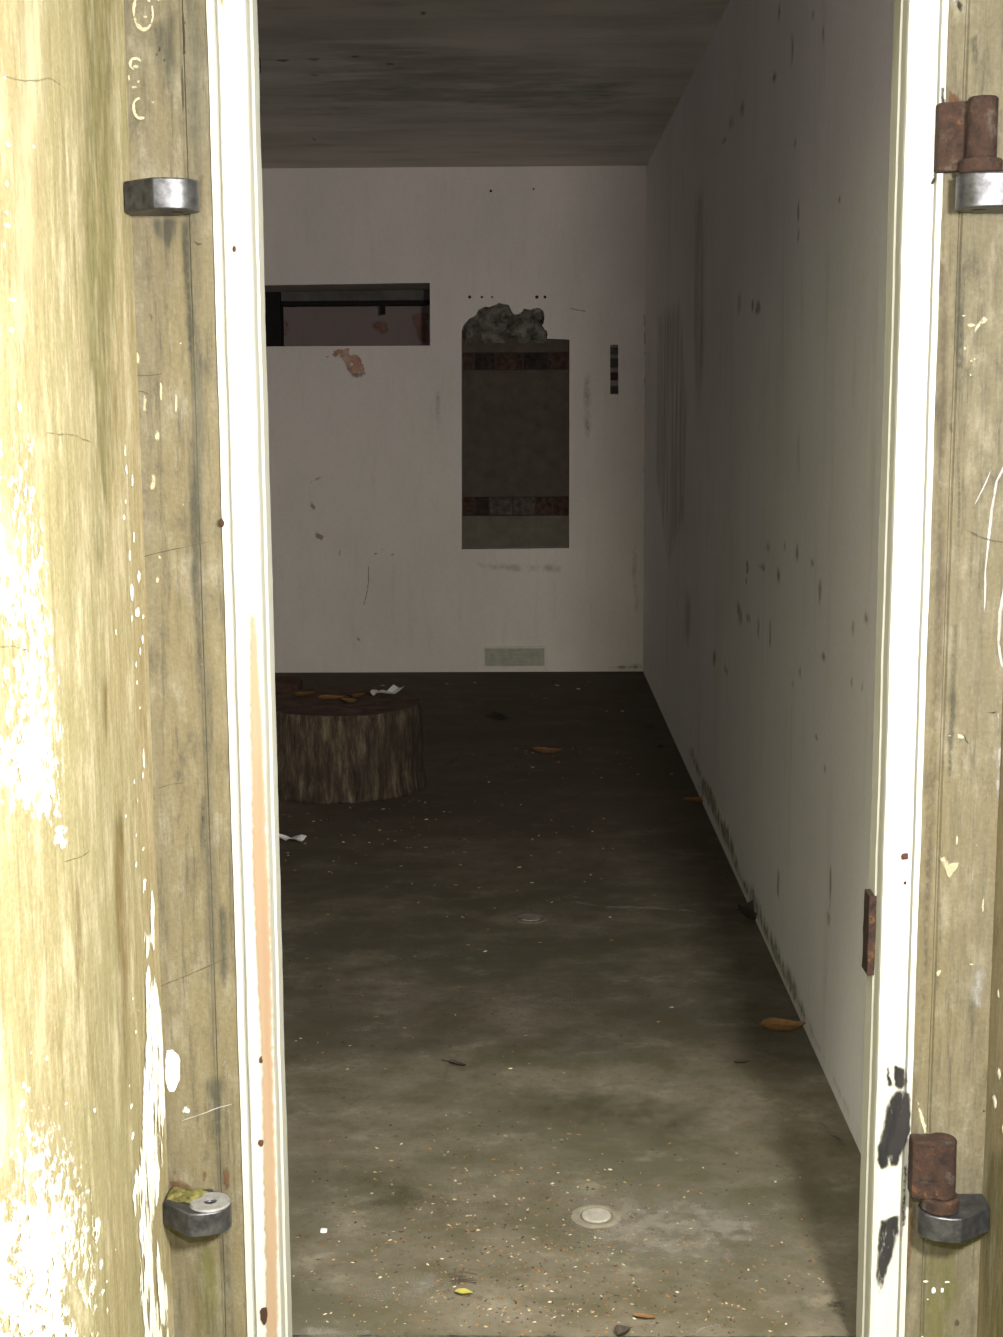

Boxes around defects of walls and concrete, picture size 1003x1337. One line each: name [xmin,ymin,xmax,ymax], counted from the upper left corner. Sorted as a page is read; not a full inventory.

peeling [20,0,45,278]
peeling [0,434,68,849]
peeling [0,1082,108,1337]
peeling [129,833,180,1337]